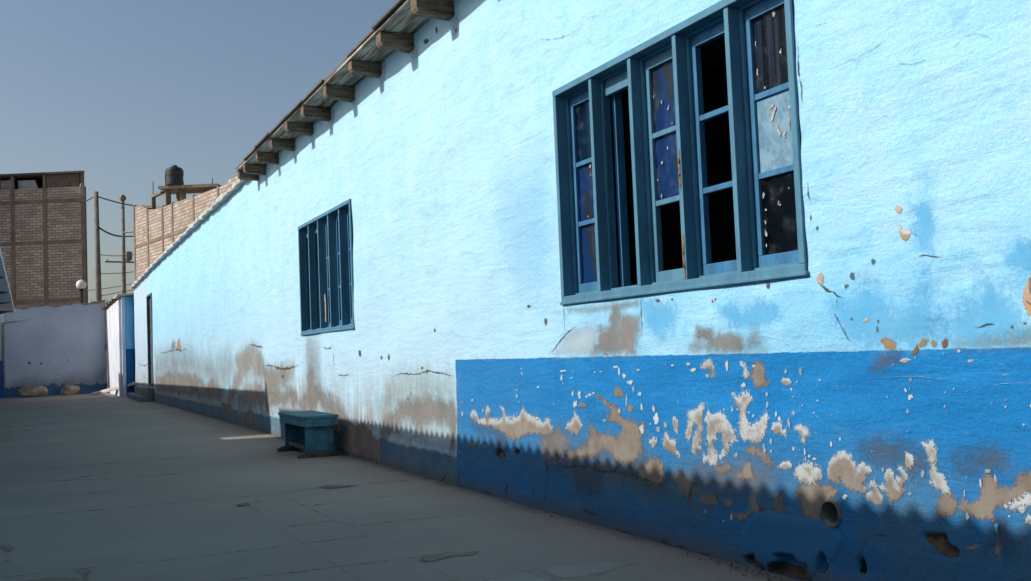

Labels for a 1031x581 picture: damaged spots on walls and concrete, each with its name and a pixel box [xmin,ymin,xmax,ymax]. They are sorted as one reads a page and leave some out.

flaking render [1022,277,1031,315]
crack [395,369,452,377]
leakage [381,397,457,449]
peeling [462,358,1031,533]
flaking render [924,533,960,558]
flaking render [746,556,828,581]